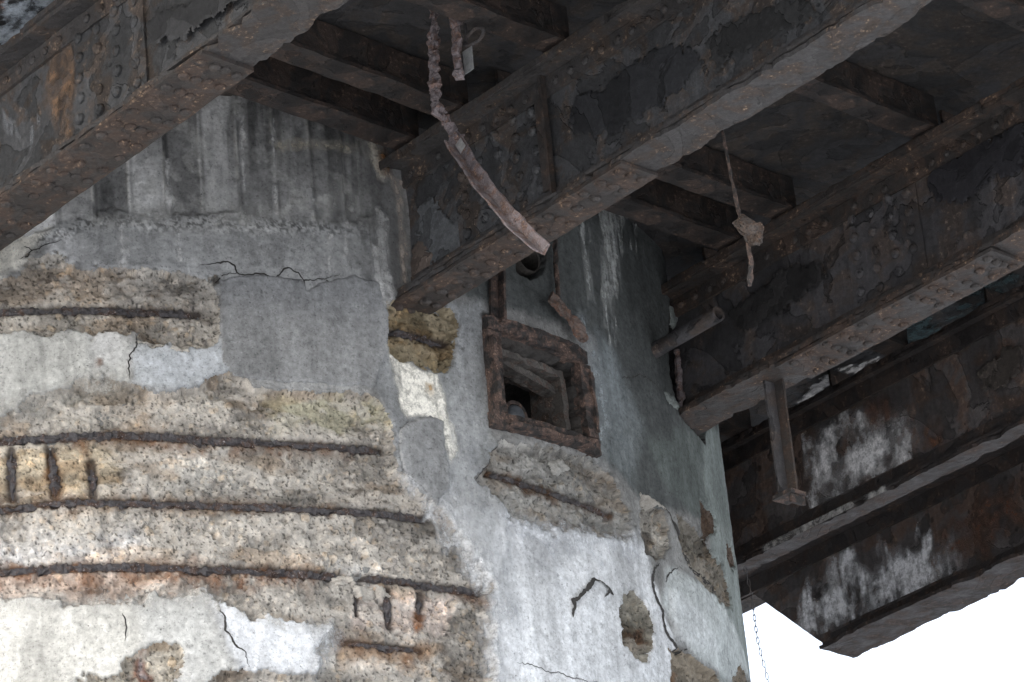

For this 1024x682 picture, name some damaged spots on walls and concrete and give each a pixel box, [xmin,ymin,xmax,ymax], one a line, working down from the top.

rust [49,49,73,135]
spalling [0,251,221,353]
leakage [373,209,406,303]
rust [674,349,686,407]
leakage [797,411,910,535]
spalling [0,371,495,682]
spalling [474,439,734,607]
crack [207,593,250,667]
crack [571,577,614,617]
spalling [619,590,654,663]
crack [651,509,716,656]
leakage [800,533,942,632]